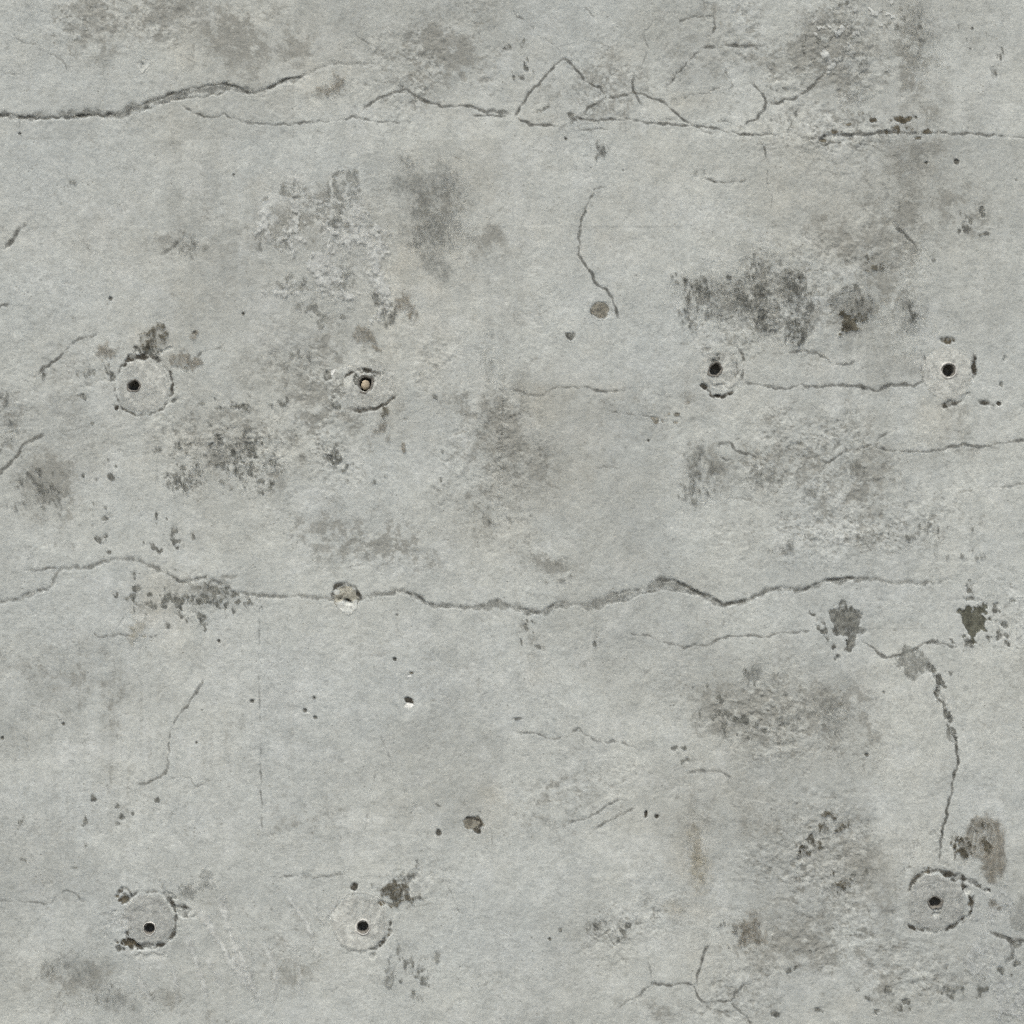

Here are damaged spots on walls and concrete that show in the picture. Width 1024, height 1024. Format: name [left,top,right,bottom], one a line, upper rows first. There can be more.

crack [0,77,300,120]
crack [368,59,718,129]
crack [742,79,818,150]
crack [822,130,895,145]
crack [579,255,618,313]
damp [737,270,814,346]
hole [331,583,361,614]
crack [375,577,883,615]
spalling [809,600,864,660]
spalling [937,580,1010,647]
spalling [895,644,930,680]
crack [876,640,959,845]